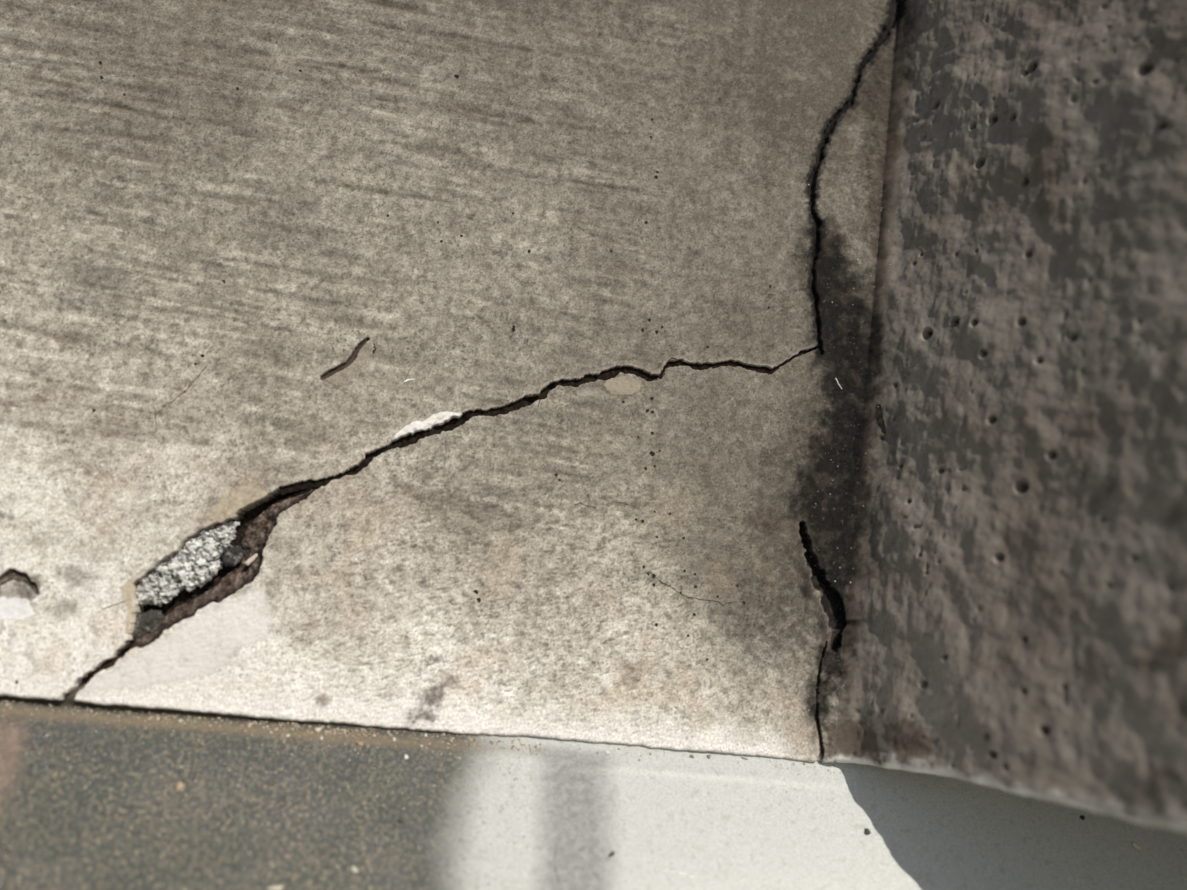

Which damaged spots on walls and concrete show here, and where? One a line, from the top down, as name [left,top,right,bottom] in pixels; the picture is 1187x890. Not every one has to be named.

crack [280,0,906,495]
crack [155,367,207,427]
crack [574,501,639,510]
water stain [790,220,930,757]
spalling [0,570,40,620]
flaking render [82,483,320,695]
crack [650,572,745,606]
crack [82,641,138,684]